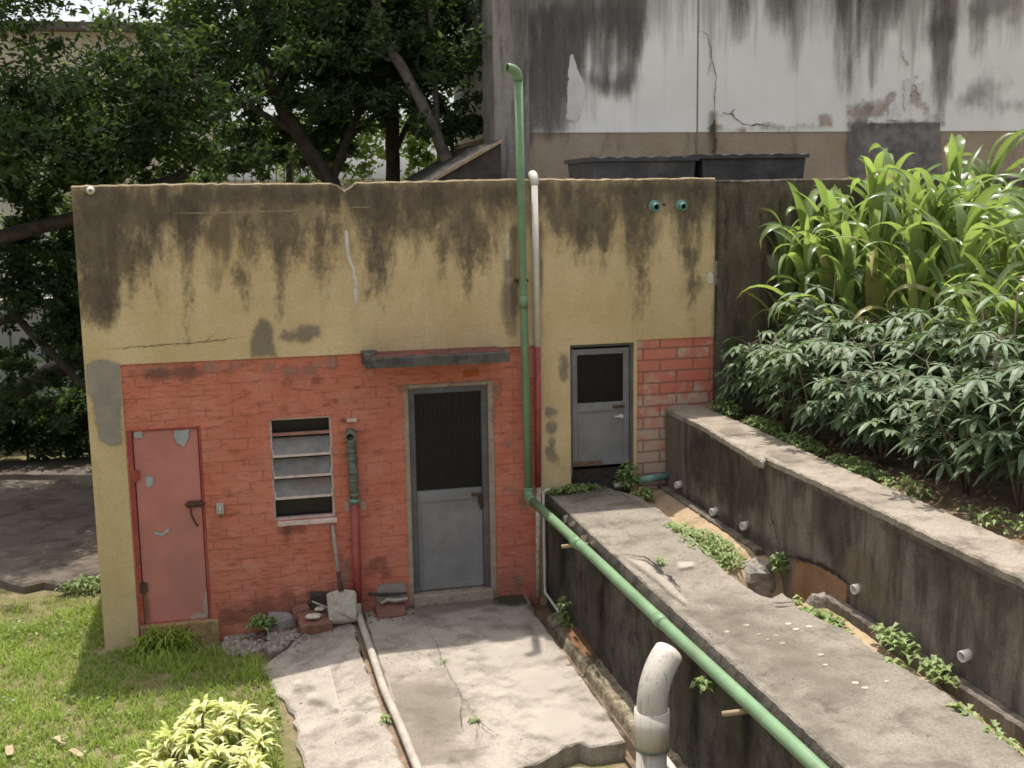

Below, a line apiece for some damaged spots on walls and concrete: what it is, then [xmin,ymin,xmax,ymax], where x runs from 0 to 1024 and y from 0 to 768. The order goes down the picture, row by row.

peeling [566,54,586,122]
water stain [514,0,646,140]
crack [702,31,774,154]
water stain [836,0,904,83]
peeling [848,50,925,121]
water stain [933,0,958,105]
water stain [74,182,517,322]
water stain [540,121,927,322]
peeling [174,429,189,447]
crack [430,633,493,743]